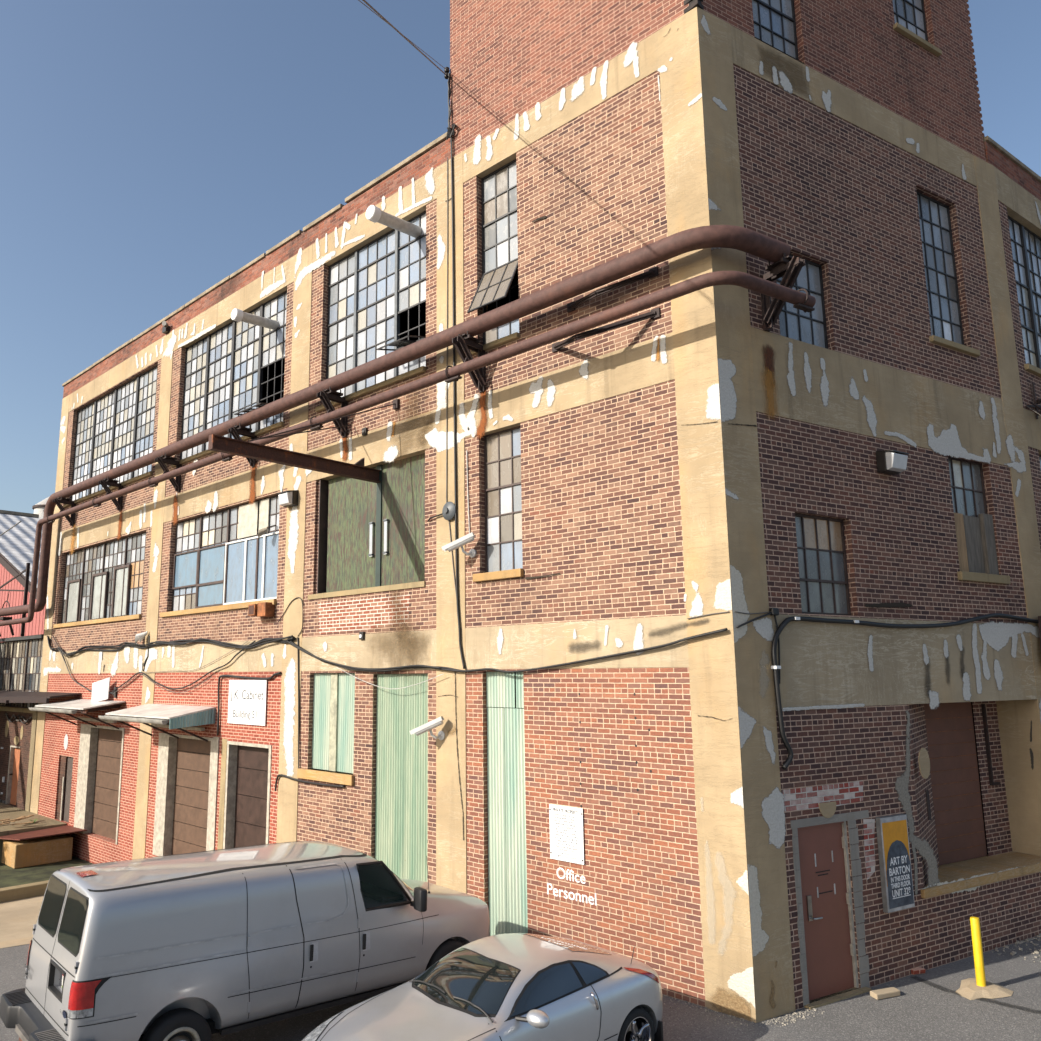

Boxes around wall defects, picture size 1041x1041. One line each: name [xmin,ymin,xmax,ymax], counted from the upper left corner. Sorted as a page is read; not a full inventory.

peeling [559,60,609,110]
peeling [381,167,435,217]
peeling [260,214,365,298]
peeling [425,381,513,452]
peeling [706,359,737,422]
rust [763,346,777,417]
peeling [849,369,1026,497]
peeling [943,621,1040,701]
peeling [261,644,297,776]
peeling [730,787,744,808]
peeling [761,781,863,848]
peeling [712,864,769,1019]